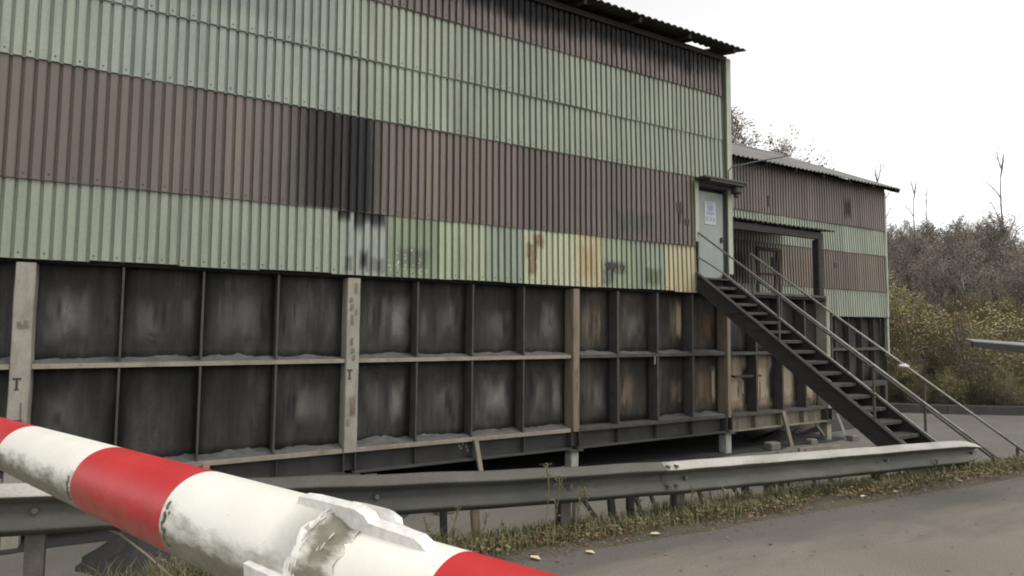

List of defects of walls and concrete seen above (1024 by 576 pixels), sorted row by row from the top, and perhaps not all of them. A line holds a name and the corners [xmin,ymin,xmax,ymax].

leakage [329,114,385,226]
corrosion [528,235,543,273]
corrosion [696,370,715,400]